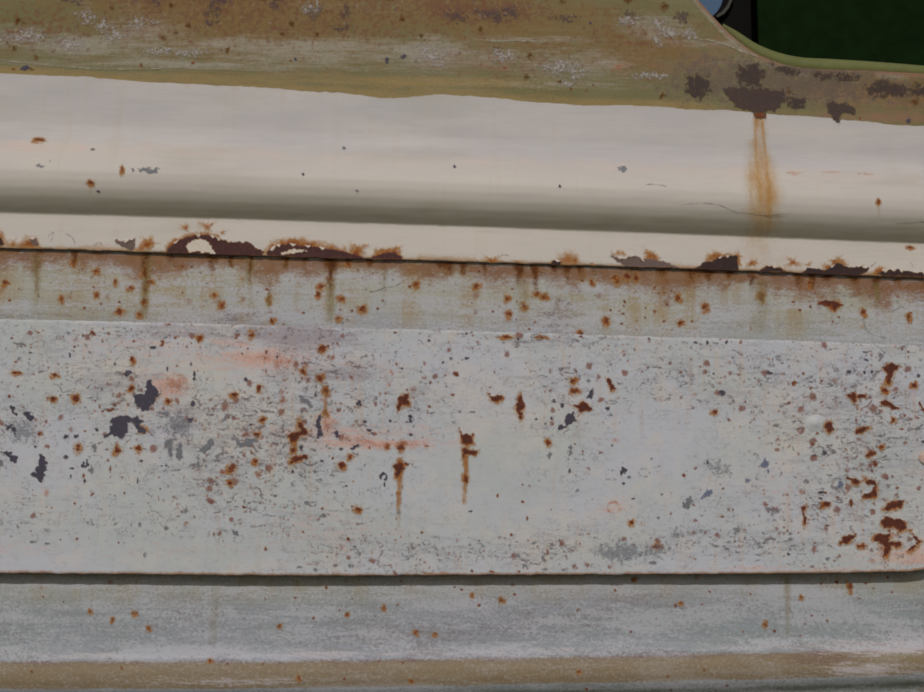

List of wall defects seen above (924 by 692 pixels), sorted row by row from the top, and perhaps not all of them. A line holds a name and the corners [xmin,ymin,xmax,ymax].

peeling [723,62,806,119]
peeling [165,232,402,260]
rust [314,259,353,300]
rust [551,254,596,286]
rust [687,270,734,280]
peeling [694,253,741,270]
peeling [803,260,924,277]
rust [792,295,868,322]
peeling [95,380,161,440]
peeling [30,445,48,482]
rust [459,428,478,502]
rust [839,444,923,559]